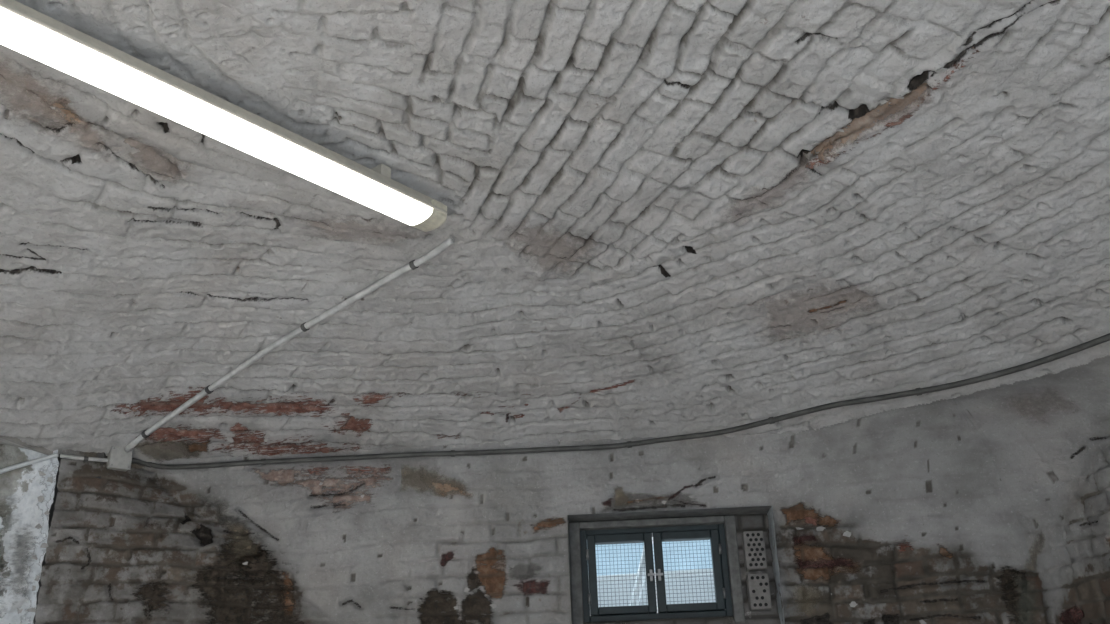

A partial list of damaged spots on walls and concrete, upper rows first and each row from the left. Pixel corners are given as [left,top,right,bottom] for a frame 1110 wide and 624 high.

spalling [797,43,979,169]
crack [133,206,281,229]
crack [0,242,85,275]
peeling [558,380,634,413]
peeling [112,387,406,513]
leakage [0,502,29,593]
peeling [417,547,550,624]
peeling [792,526,861,624]
spalling [864,598,981,624]